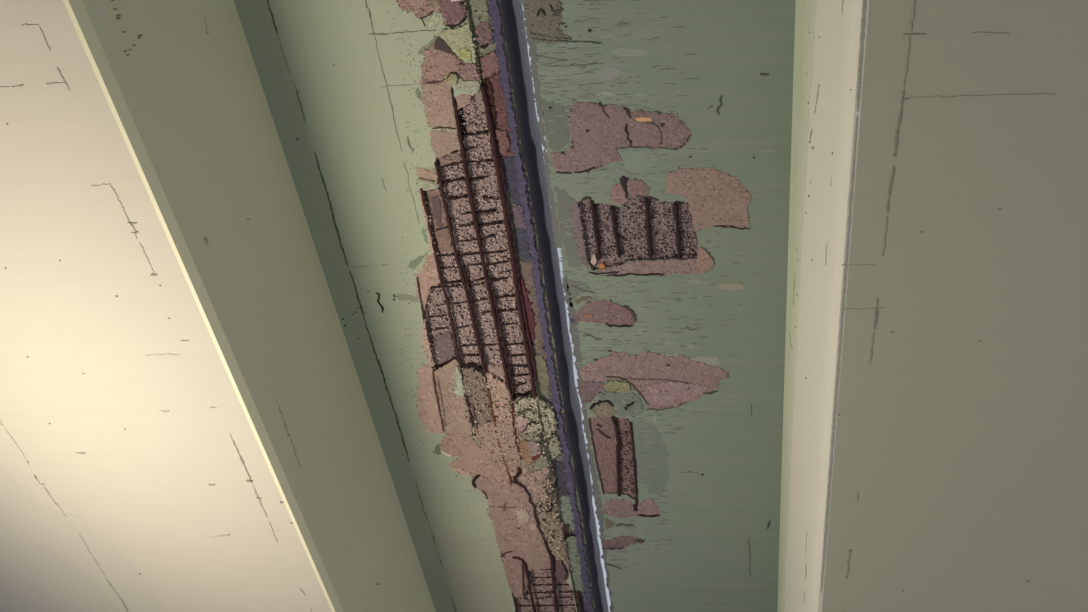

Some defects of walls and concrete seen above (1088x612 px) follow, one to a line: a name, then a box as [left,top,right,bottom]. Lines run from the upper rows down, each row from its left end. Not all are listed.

crack [91,184,158,276]
spalling [396,0,596,612]
corrosion [520,277,536,346]
spalling [573,299,637,328]
spalling [550,100,755,276]
crack [0,421,129,612]
spalling [576,348,730,519]